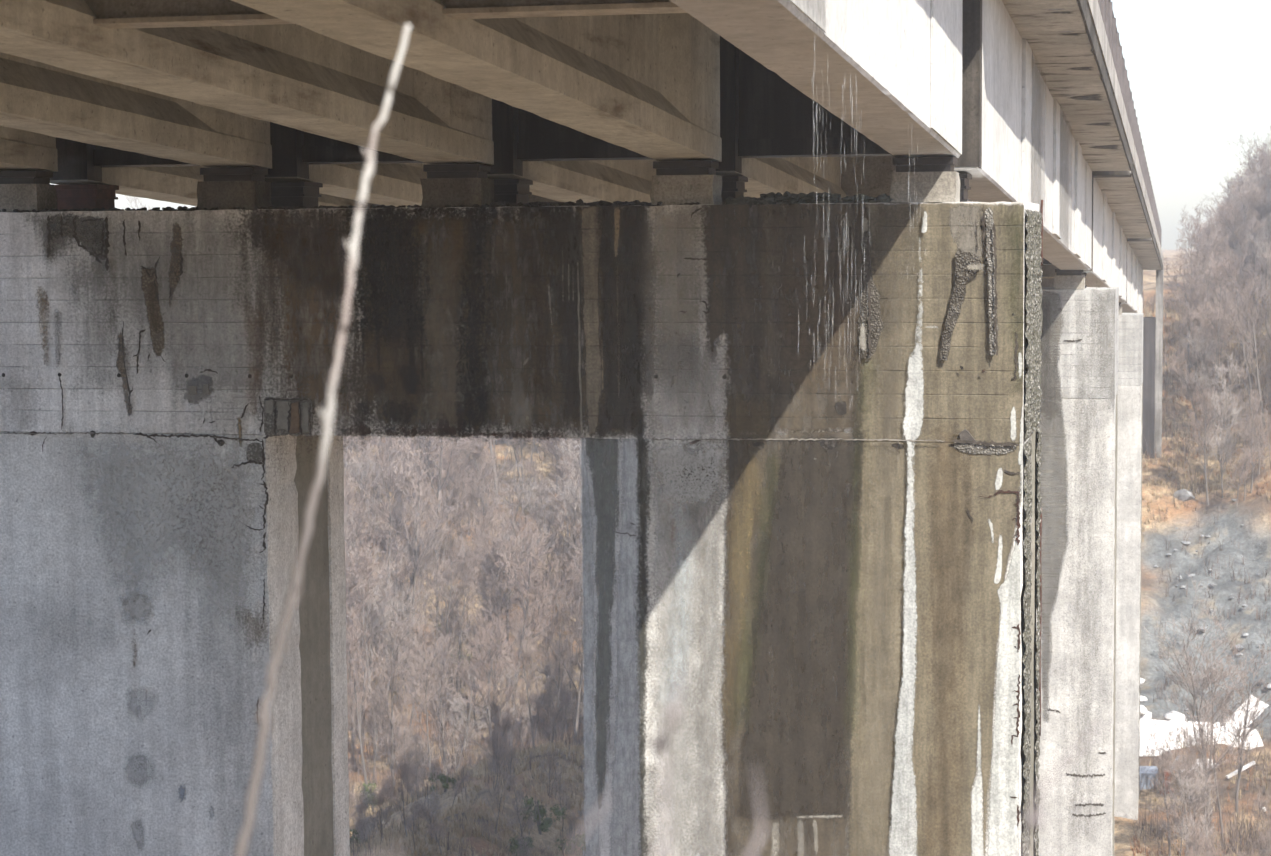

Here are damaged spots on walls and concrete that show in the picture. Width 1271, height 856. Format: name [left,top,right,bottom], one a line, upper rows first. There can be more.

spalling [231,396,313,480]
water stain [240,203,1068,856]
spalling [940,206,998,361]
spalling [951,200,1043,856]